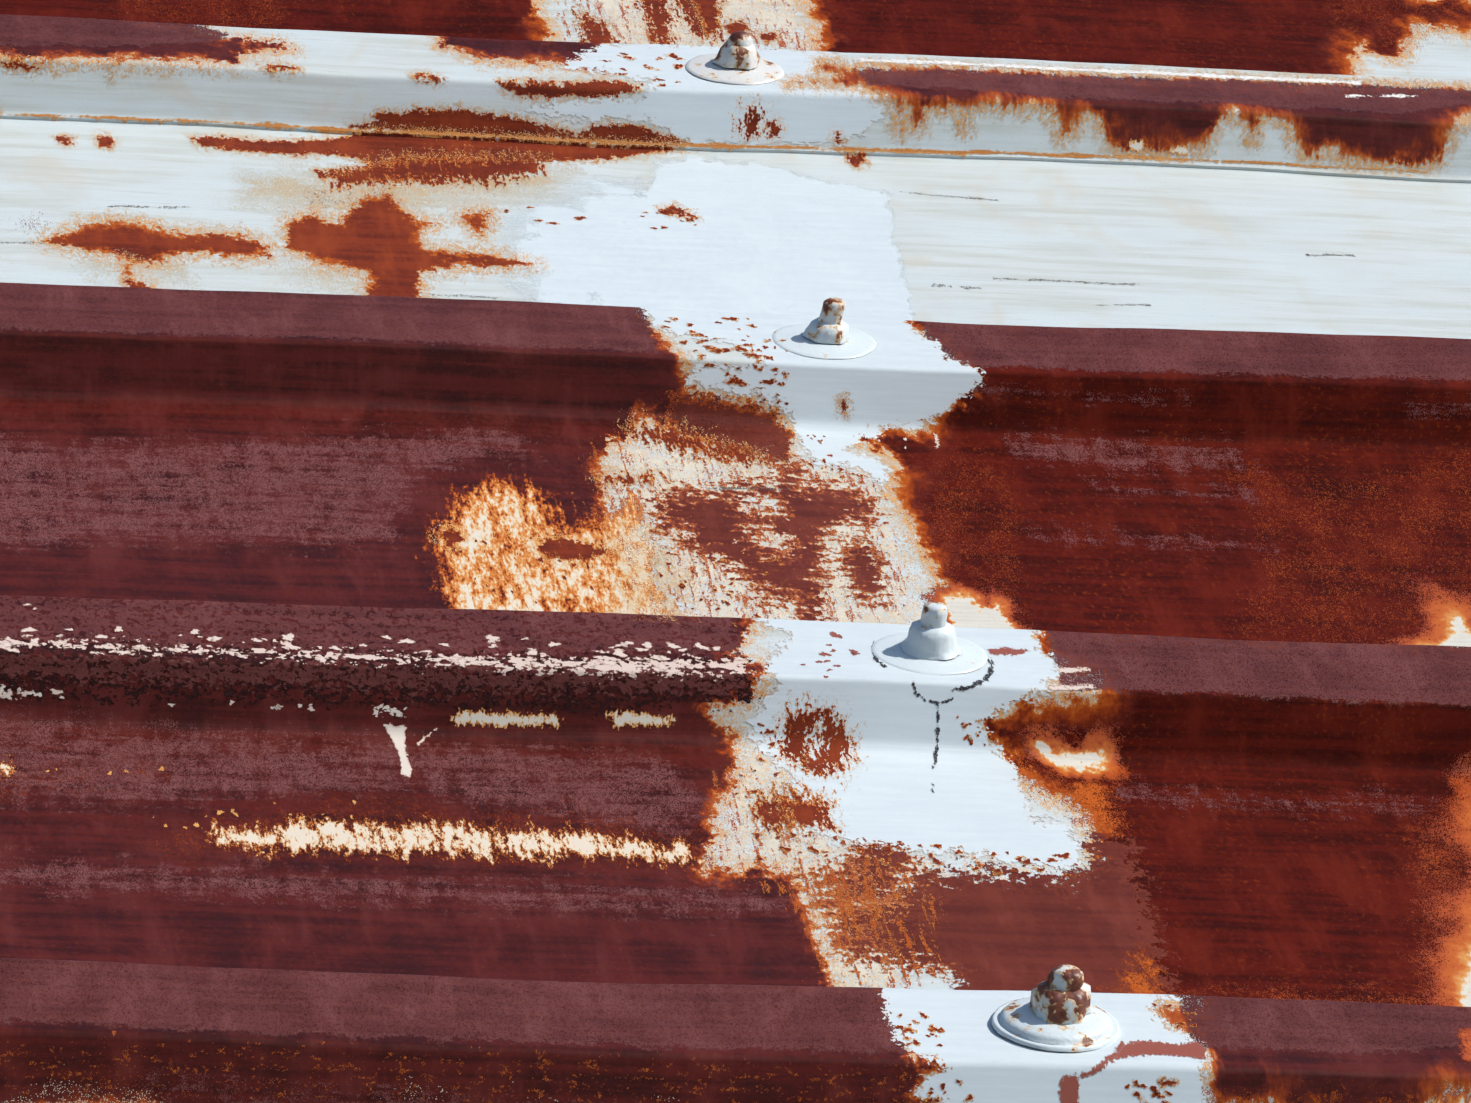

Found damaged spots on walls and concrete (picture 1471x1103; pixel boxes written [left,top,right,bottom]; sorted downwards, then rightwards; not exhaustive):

corrosion [407,67,450,92]
corrosion [643,53,686,87]
corrosion [0,103,221,125]
corrosion [48,129,80,151]
corrosion [89,129,121,153]
peeling [0,603,754,684]
peeling [0,684,64,700]
peeling [372,704,407,717]
peeling [450,707,564,730]
peeling [605,707,677,731]
corrosion [763,689,870,791]
peeling [127,780,736,886]